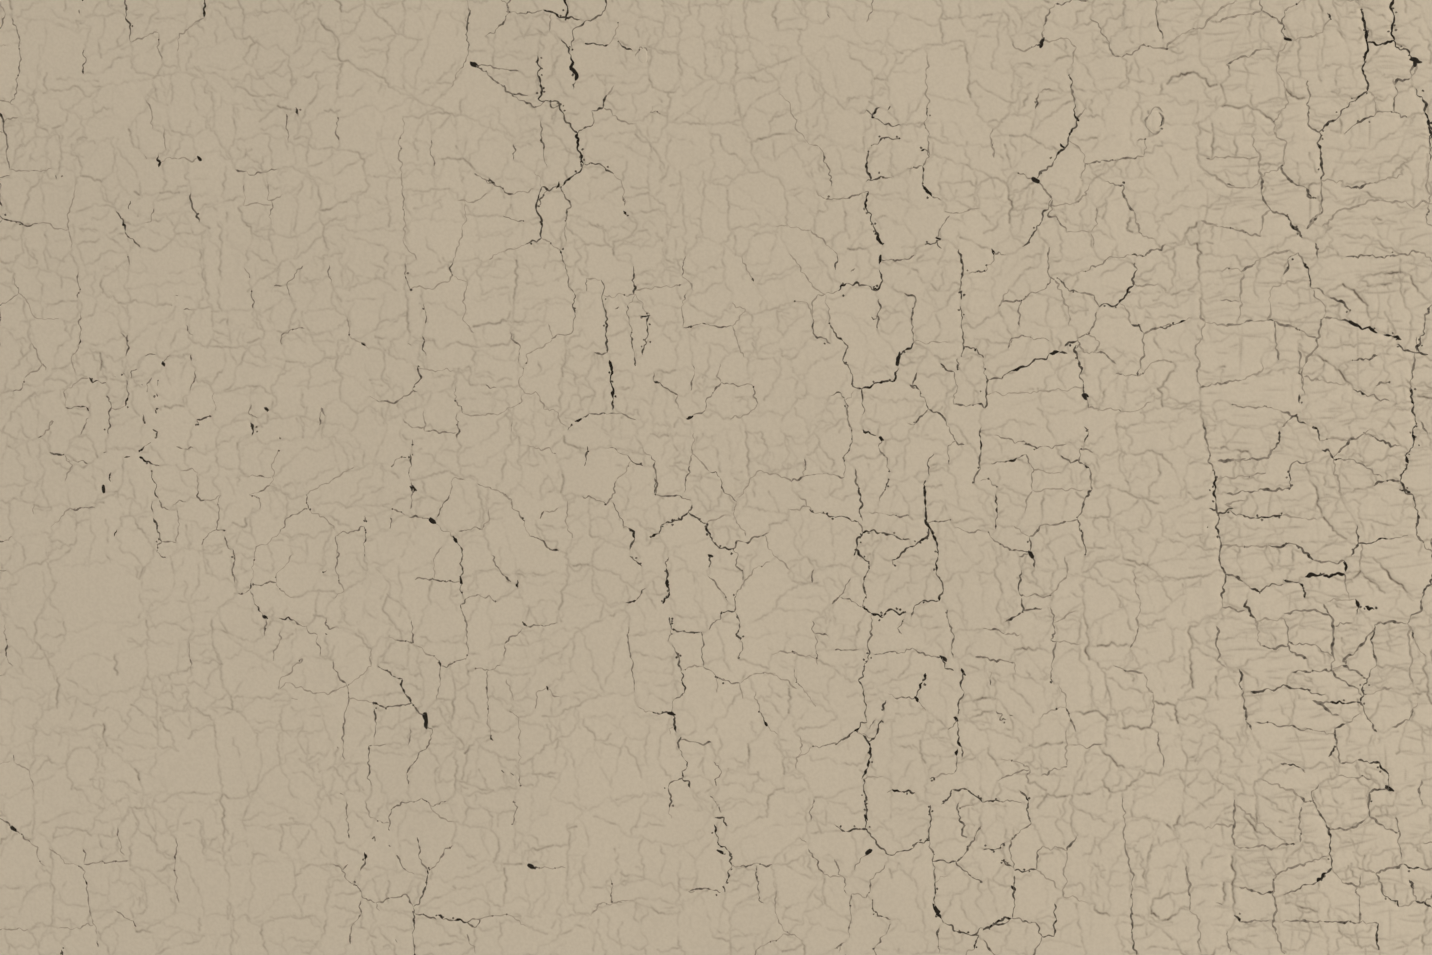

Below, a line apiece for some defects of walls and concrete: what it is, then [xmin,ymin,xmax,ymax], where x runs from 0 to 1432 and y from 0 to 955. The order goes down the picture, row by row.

crack [124,0,206,59]
crack [0,5,76,247]
crack [145,101,202,222]
crack [235,108,301,225]
crack [116,201,154,265]
crack [0,278,59,321]
crack [14,343,46,391]
crack [38,420,87,481]
crack [53,473,111,525]
crack [370,0,1432,955]
crack [63,265,524,955]
crack [0,818,136,955]